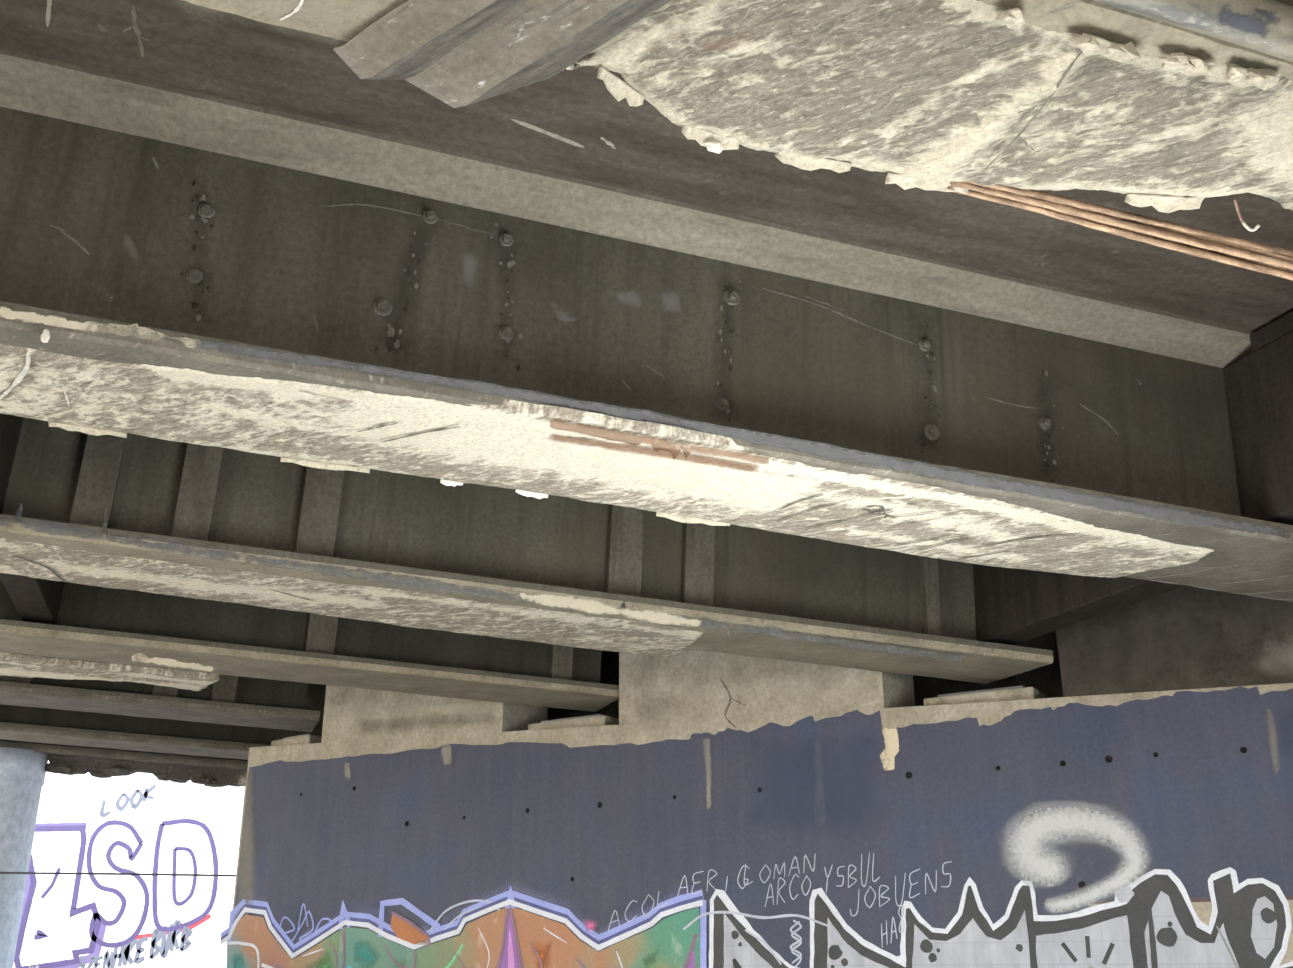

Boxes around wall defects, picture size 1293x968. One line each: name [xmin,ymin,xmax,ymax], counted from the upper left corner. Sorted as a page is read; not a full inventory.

spalling [563,0,1293,213]
peeling [0,306,161,335]
spalling [0,337,1285,578]
corrosion [550,420,769,471]
spalling [0,506,963,662]
spalling [0,652,220,691]
peeling [880,727,899,770]